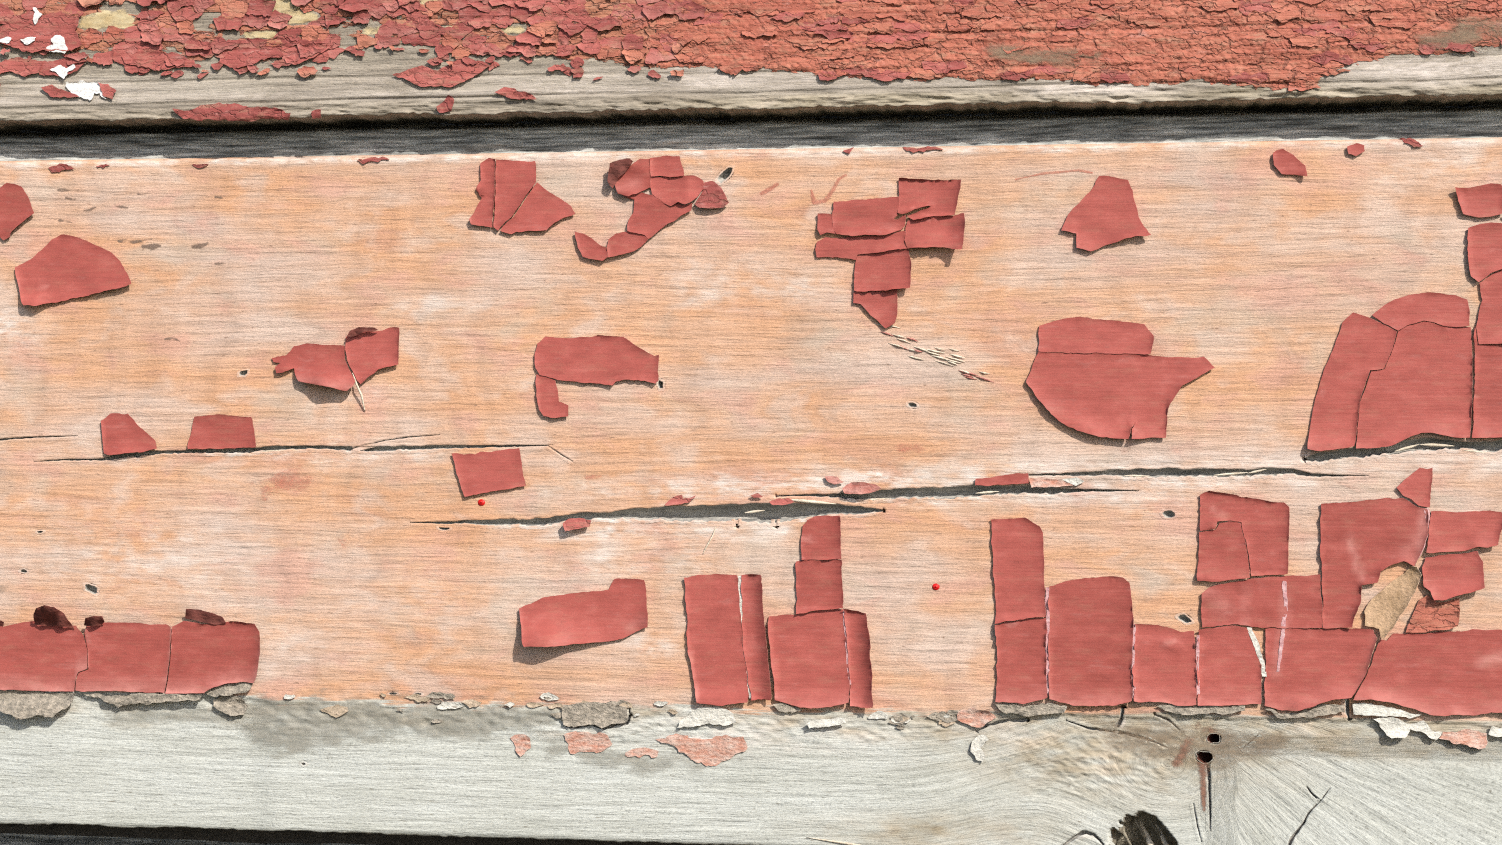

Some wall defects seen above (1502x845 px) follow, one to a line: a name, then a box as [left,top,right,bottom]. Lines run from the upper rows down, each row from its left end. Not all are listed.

peeling [172,102,291,122]
peeling [0,0,1161,113]
peeling [15,234,131,306]
peeling [469,155,735,261]
peeling [815,178,965,328]
peeling [1308,183,1502,451]
peeling [1026,317,1215,439]
crack [0,431,575,466]
crack [410,434,1502,530]
peeling [0,605,260,720]
peeling [519,578,648,647]
peeling [606,468,1502,766]